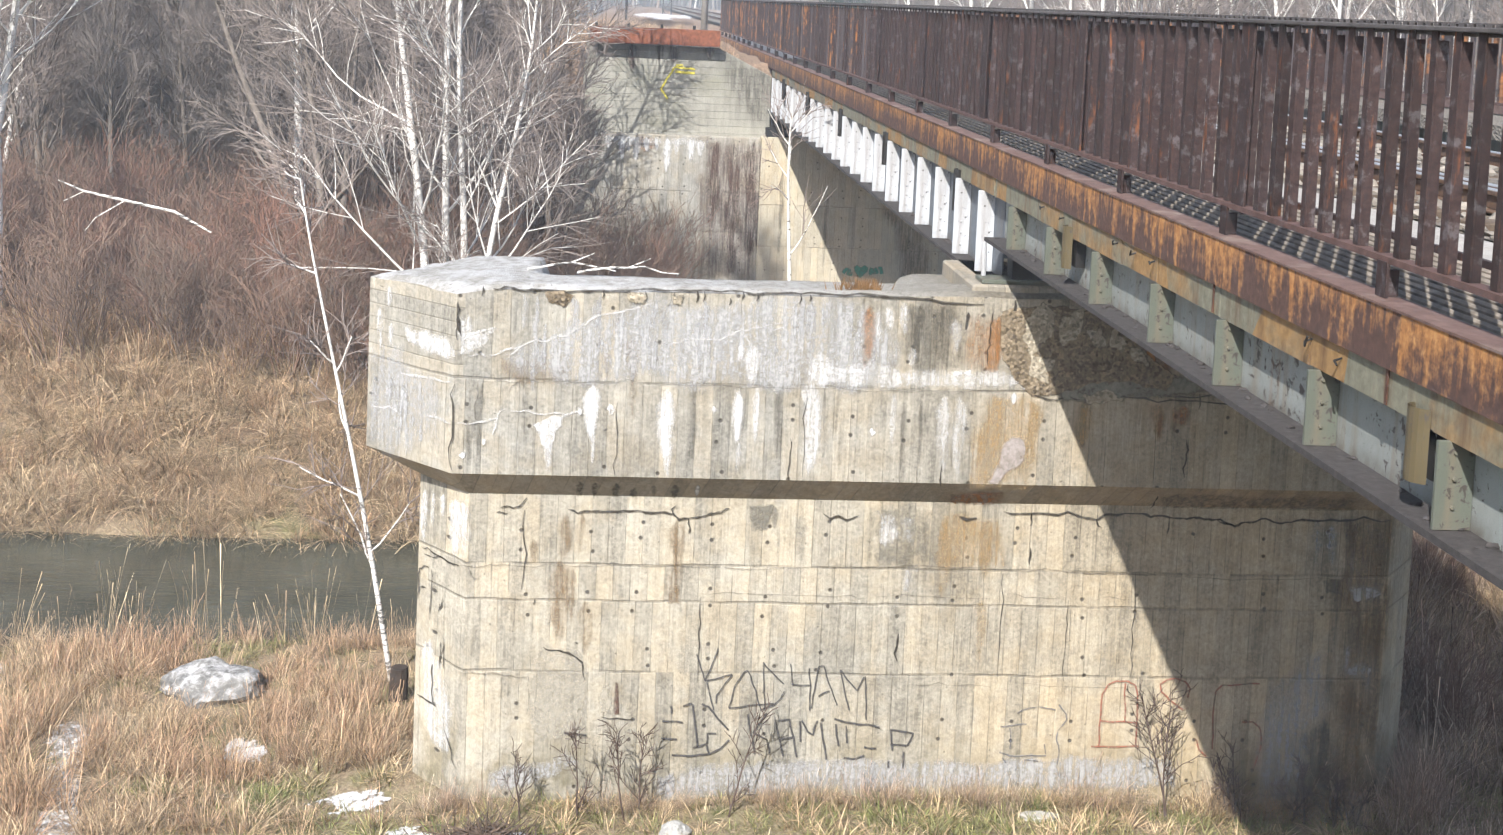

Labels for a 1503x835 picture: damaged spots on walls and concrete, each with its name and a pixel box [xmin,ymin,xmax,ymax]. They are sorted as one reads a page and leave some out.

water stain [516,298,957,466]
water stain [954,370,1039,481]
spalling [1000,303,1174,405]
crack [1122,394,1227,408]
crack [496,498,535,603]
crack [568,505,730,533]
crack [824,513,858,521]
crack [939,443,1390,676]